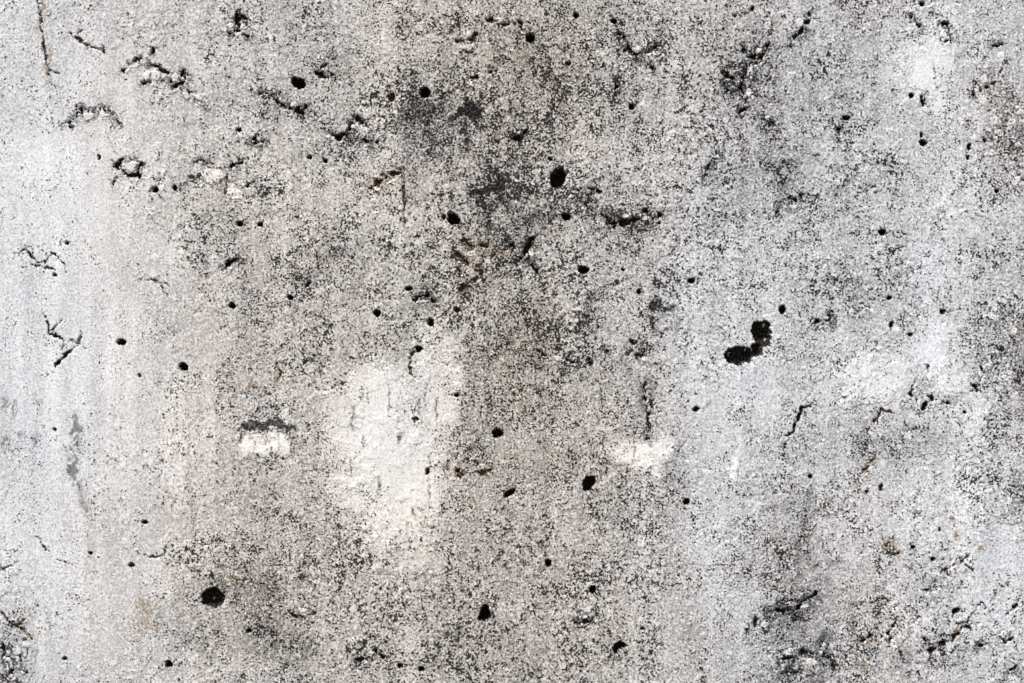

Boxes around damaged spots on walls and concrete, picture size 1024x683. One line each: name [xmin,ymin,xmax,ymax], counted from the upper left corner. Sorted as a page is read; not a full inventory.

crack [18,245,67,273]
crack [42,313,87,375]
crack [783,402,819,451]